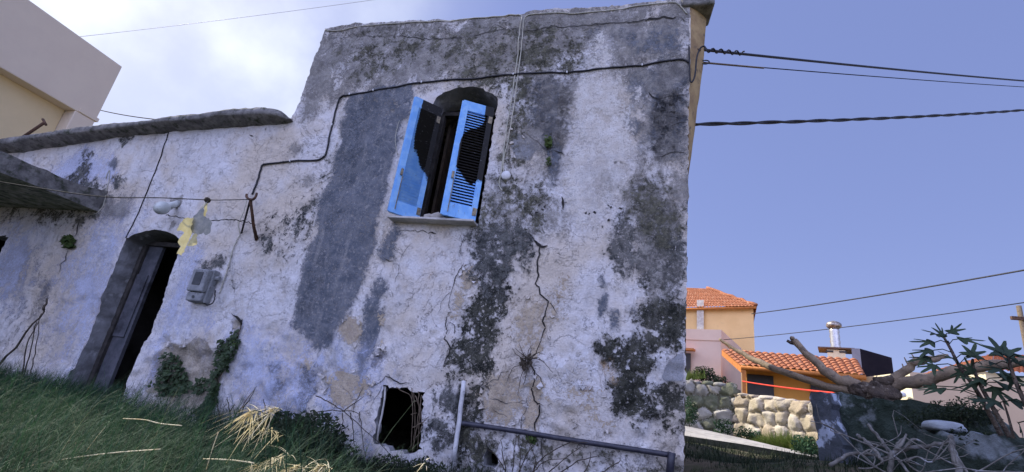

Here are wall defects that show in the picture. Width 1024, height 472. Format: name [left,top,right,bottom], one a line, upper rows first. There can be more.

spalling [144,320,243,410]
water stain [258,0,691,472]
crack [473,197,567,472]